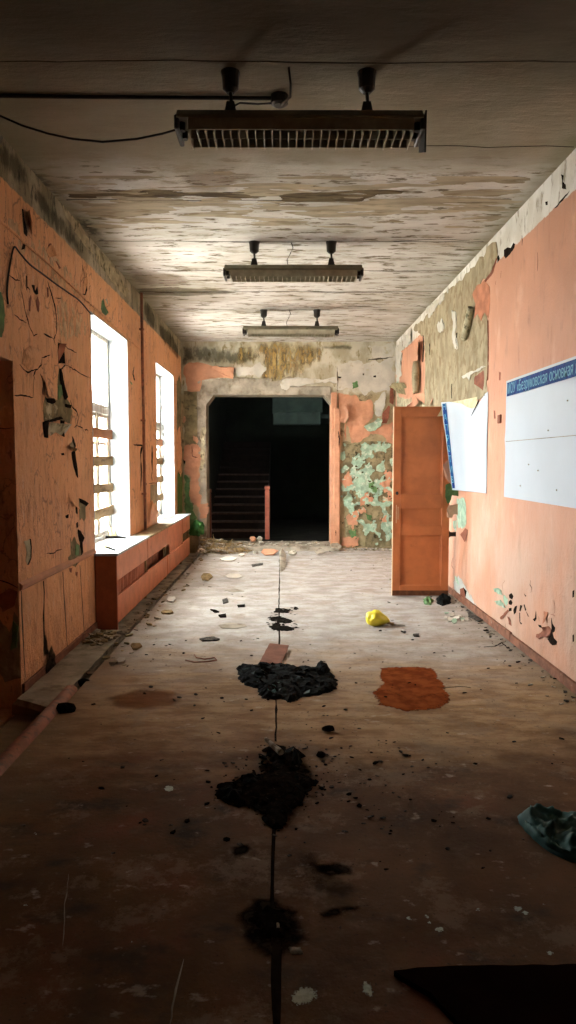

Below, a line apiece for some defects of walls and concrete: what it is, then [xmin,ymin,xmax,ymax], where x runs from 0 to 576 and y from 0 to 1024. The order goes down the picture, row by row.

crack [9,275,87,398]
spalling [42,343,78,478]
peeling [177,242,515,548]
spalling [65,491,89,576]
peeling [493,581,557,645]